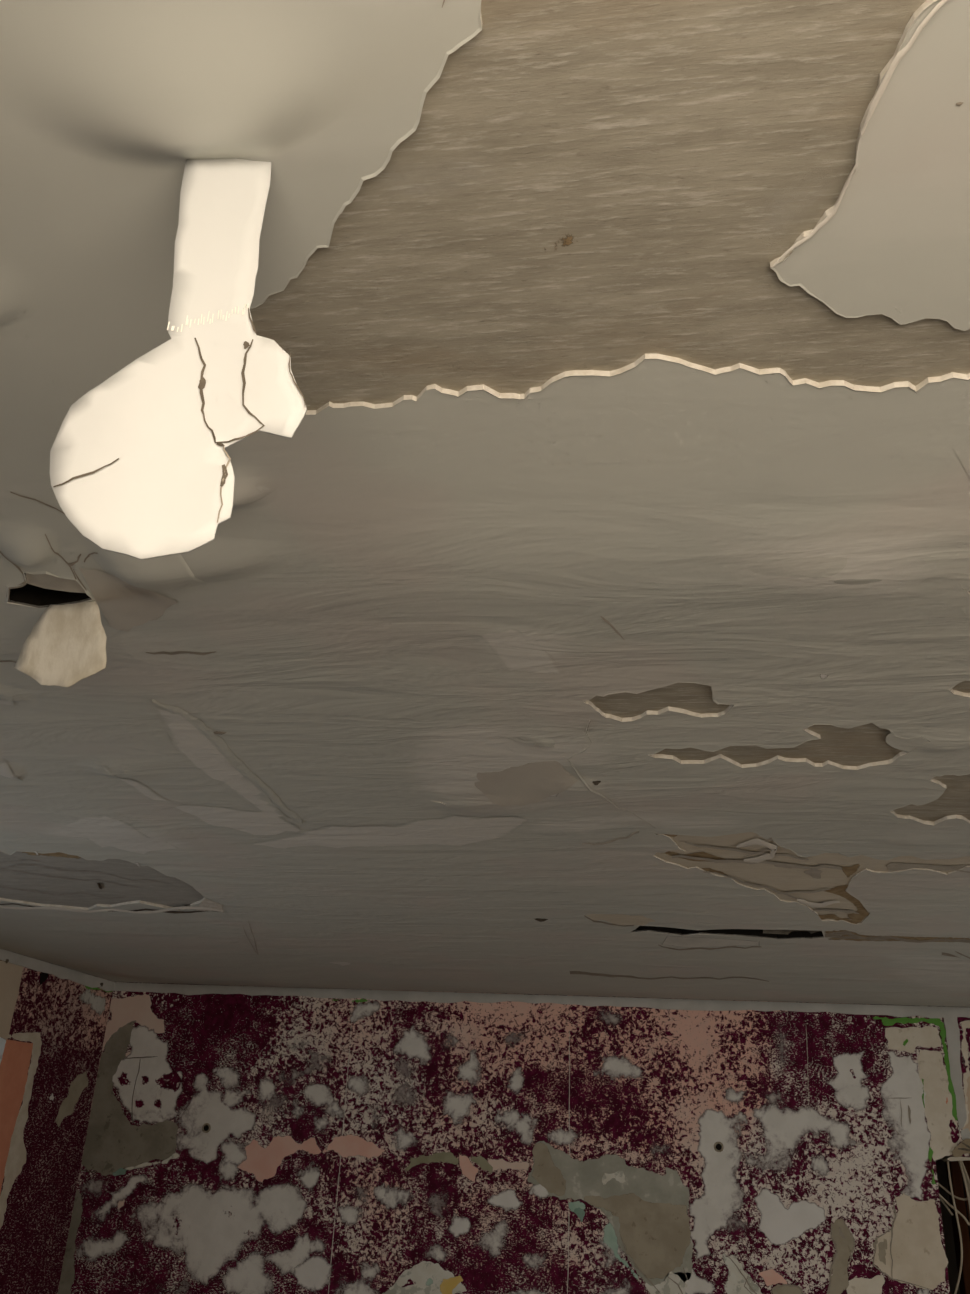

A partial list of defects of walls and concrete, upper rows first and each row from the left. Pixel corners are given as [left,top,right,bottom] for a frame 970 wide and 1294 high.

peeling [50,0,970,560]
peeling [14,601,107,688]
peeling [582,682,734,722]
peeling [648,723,929,770]
peeling [889,773,970,825]
peeling [0,851,224,914]
peeling [653,832,970,925]
flaking render [55,1021,180,1176]
flaking render [382,1261,467,1294]
flaking render [527,1141,694,1294]
flaking render [723,1253,804,1294]
flaking render [873,1193,948,1290]